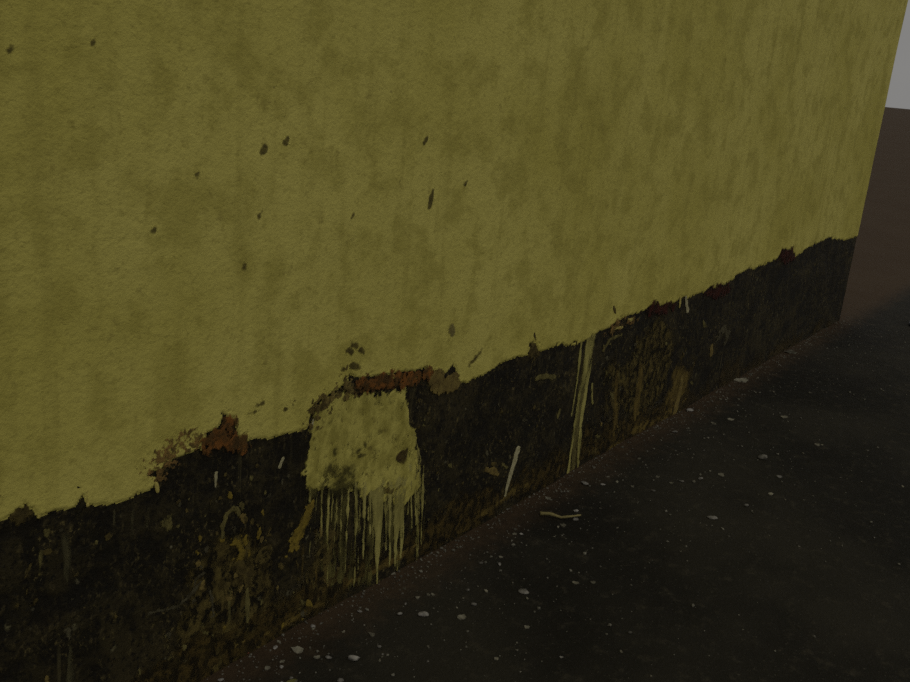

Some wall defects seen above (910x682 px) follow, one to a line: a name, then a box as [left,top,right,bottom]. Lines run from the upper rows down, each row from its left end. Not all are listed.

water stain [134,319,831,682]